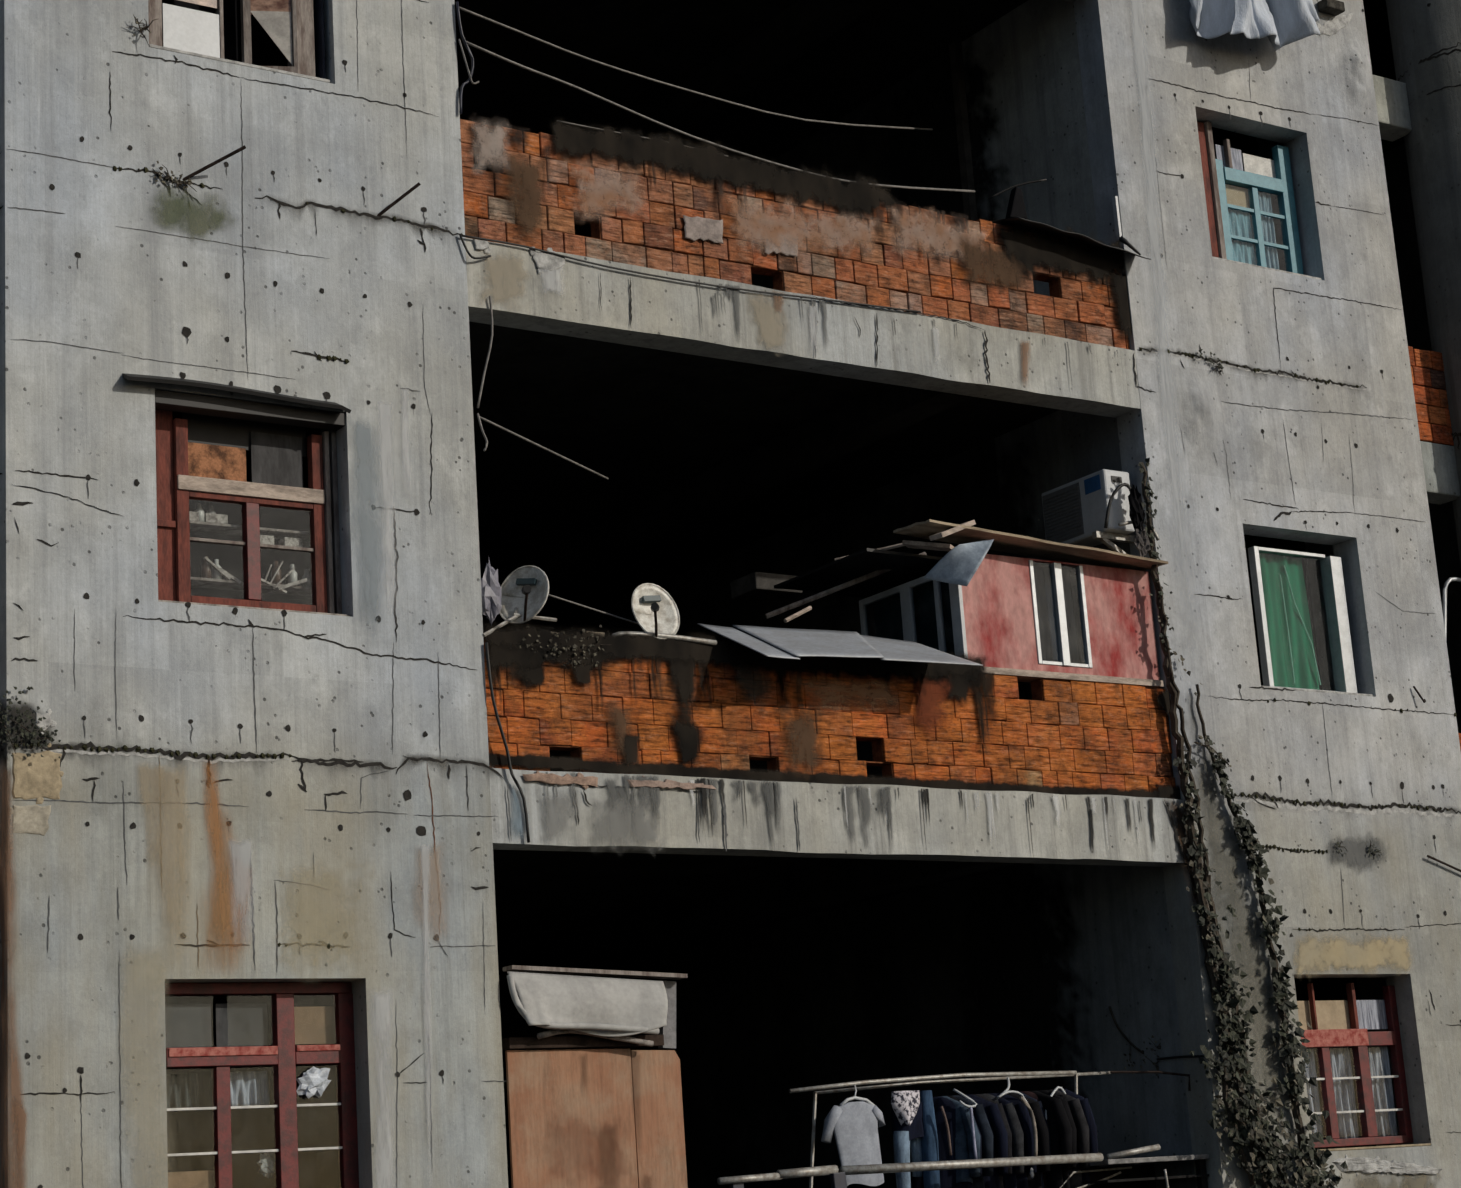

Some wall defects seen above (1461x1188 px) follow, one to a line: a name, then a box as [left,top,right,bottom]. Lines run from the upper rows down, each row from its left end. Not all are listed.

crack [109,51,438,124]
leakage [475,122,529,180]
crack [257,195,463,251]
spalling [683,215,723,244]
leakage [710,178,986,264]
crack [1133,288,1407,419]
spalling [9,709,64,836]
rust [207,766,248,942]
crack [13,741,504,956]
leakage [672,717,781,841]
leakage [1126,783,1181,844]
rust [0,768,27,1188]